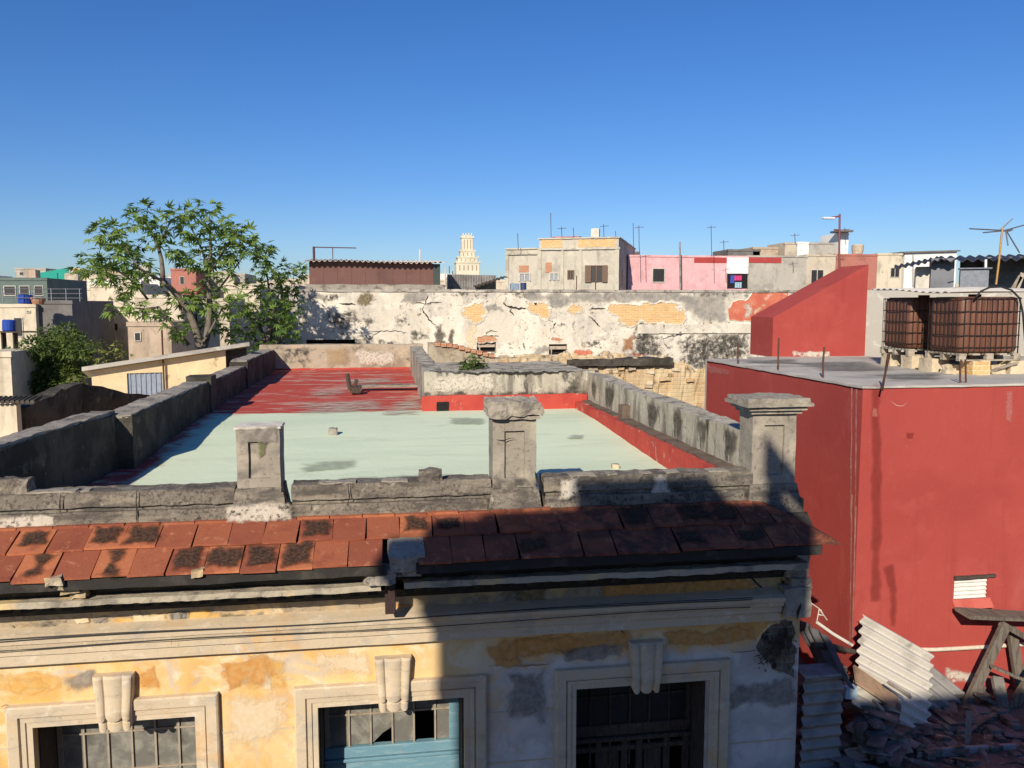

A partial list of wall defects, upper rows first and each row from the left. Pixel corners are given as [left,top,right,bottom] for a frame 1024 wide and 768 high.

crack [413,296,442,324]
spalling [459,299,488,348]
crack [486,302,526,336]
spalling [524,301,552,322]
spalling [605,300,688,329]
peeling [727,292,789,322]
leakage [630,323,660,357]
leakage [681,333,937,378]
leakage [647,402,658,424]
leakage [673,410,681,435]
leakage [698,421,707,447]
spalling [754,555,812,679]